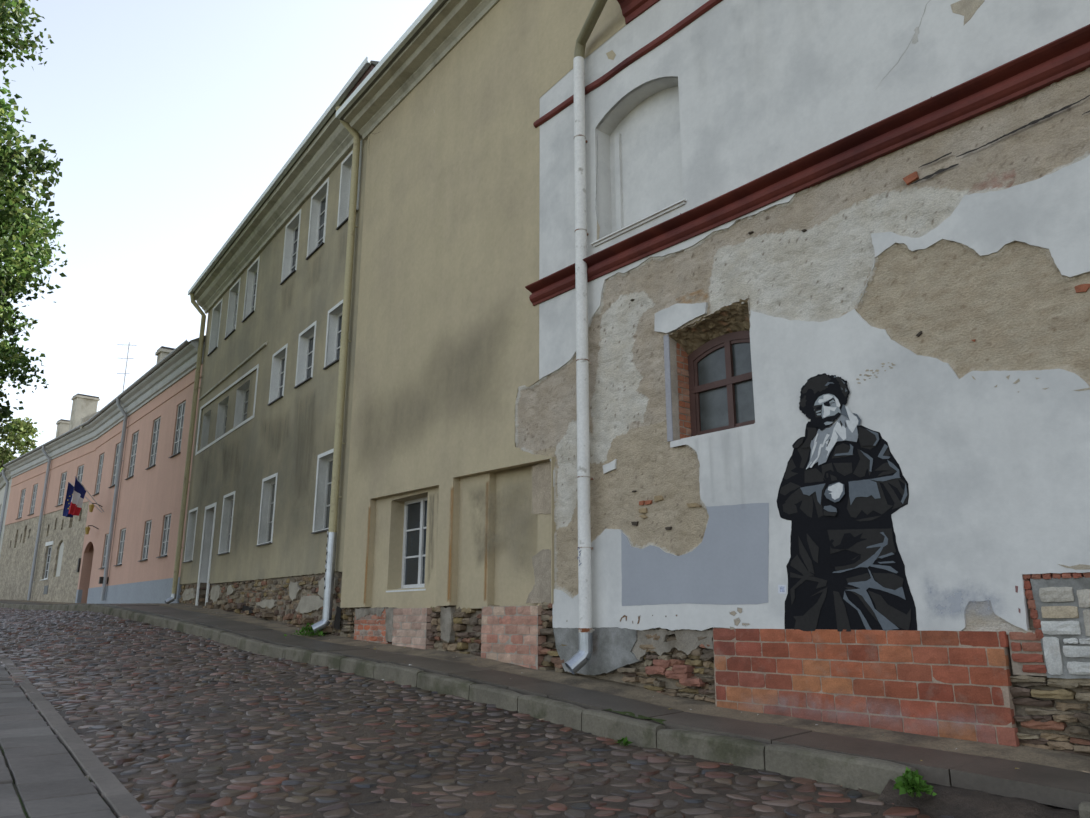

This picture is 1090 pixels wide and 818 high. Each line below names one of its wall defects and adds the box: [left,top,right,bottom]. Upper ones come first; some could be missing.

crack [879,4,927,85]
peeling [951,0,985,25]
spalling [515,67,1090,599]